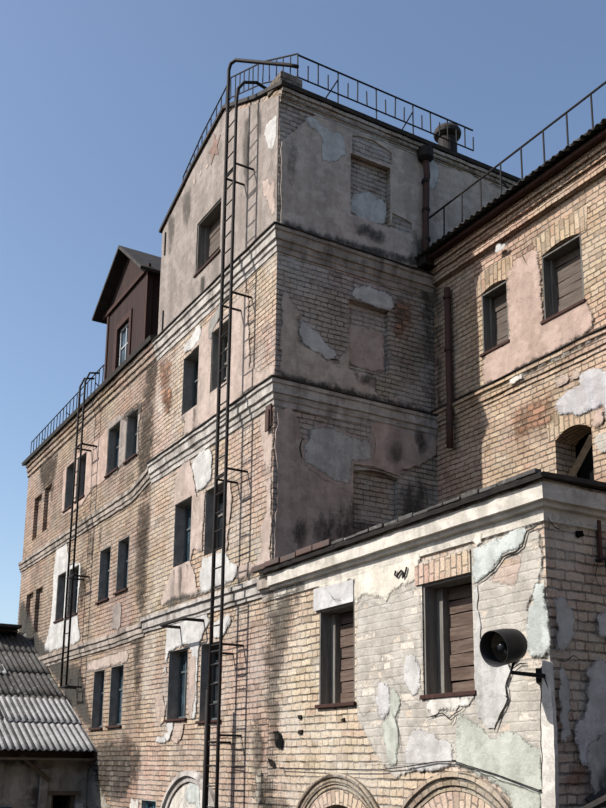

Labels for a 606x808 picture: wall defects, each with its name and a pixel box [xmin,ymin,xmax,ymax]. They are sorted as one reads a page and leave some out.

flaking render [180,292,416,434]
peeling [555,368,606,452]
flaking render [44,543,81,653]
water stain [93,737,141,800]
water stain [252,584,380,808]
peeling [319,519,575,808]
water stain [401,772,513,808]
crack [365,655,580,794]
flaking render [559,660,606,795]
flaking render [597,612,606,636]